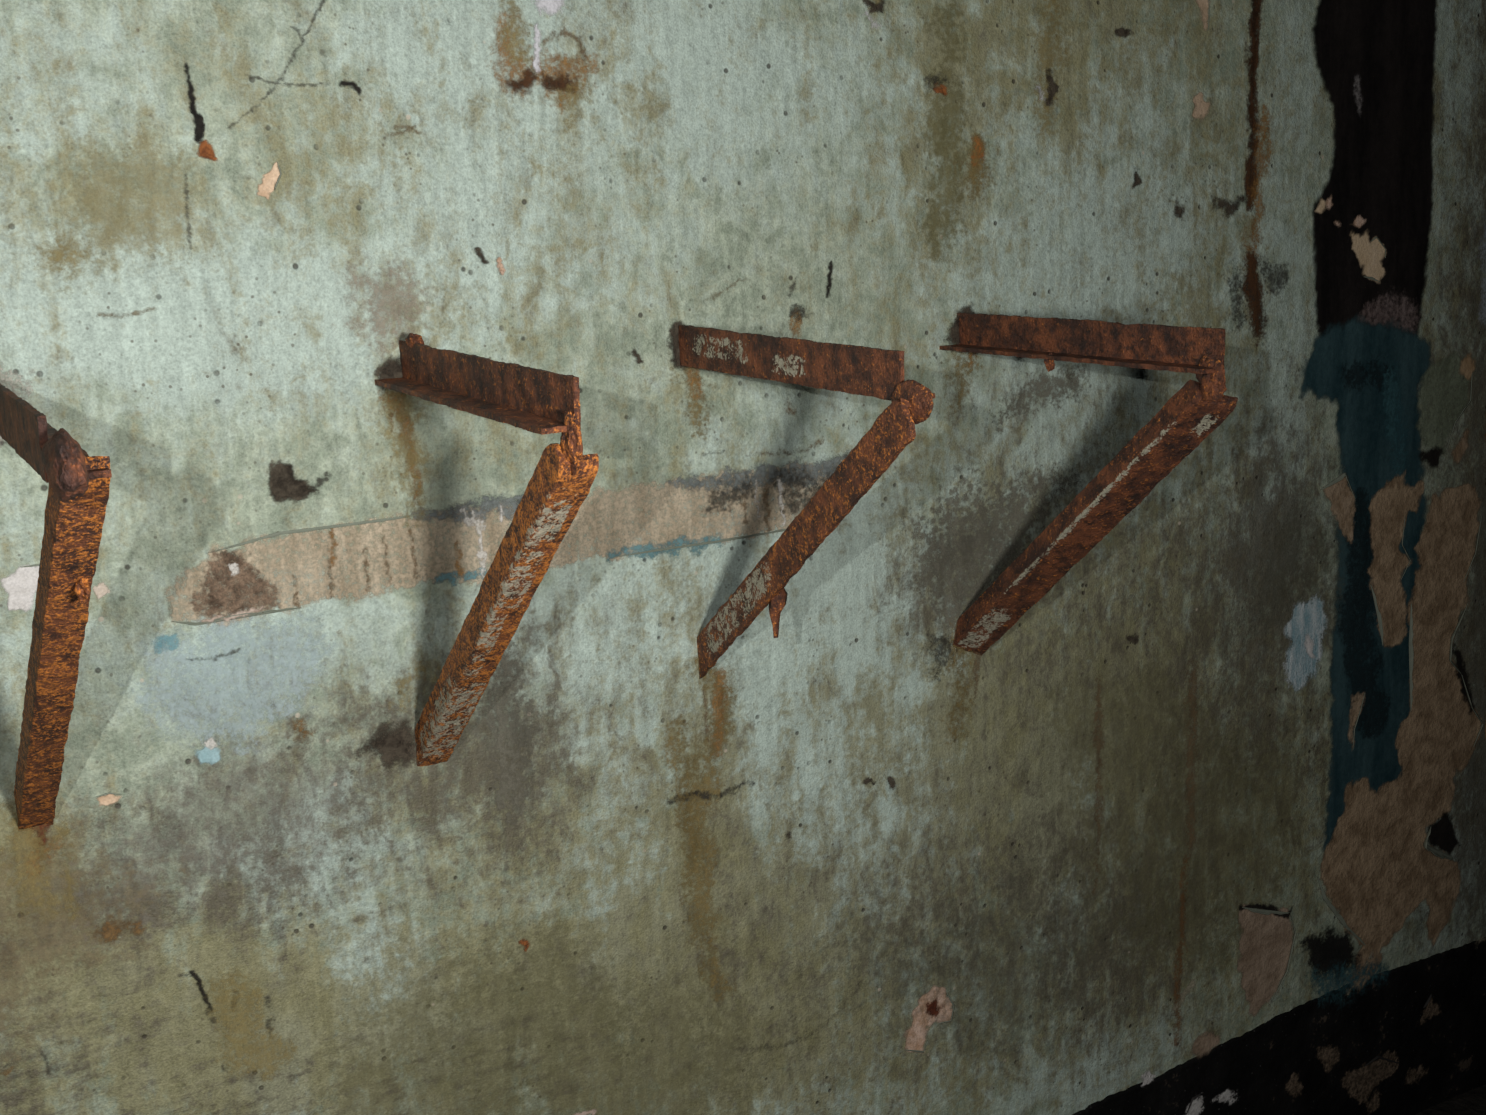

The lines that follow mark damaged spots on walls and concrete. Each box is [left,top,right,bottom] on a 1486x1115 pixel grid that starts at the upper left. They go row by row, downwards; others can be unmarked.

damp [923,6,964,256]
rust [1229,0,1271,346]
peeling [1315,197,1386,282]
rust [684,367,709,437]
rust [953,352,979,409]
spalling [269,460,329,502]
rust [380,388,428,514]
spalling [172,511,437,625]
peeling [1318,473,1486,995]
peeling [1192,1032,1220,1056]
peeling [1186,1090,1237,1115]
peeling [1317,1046,1429,1113]